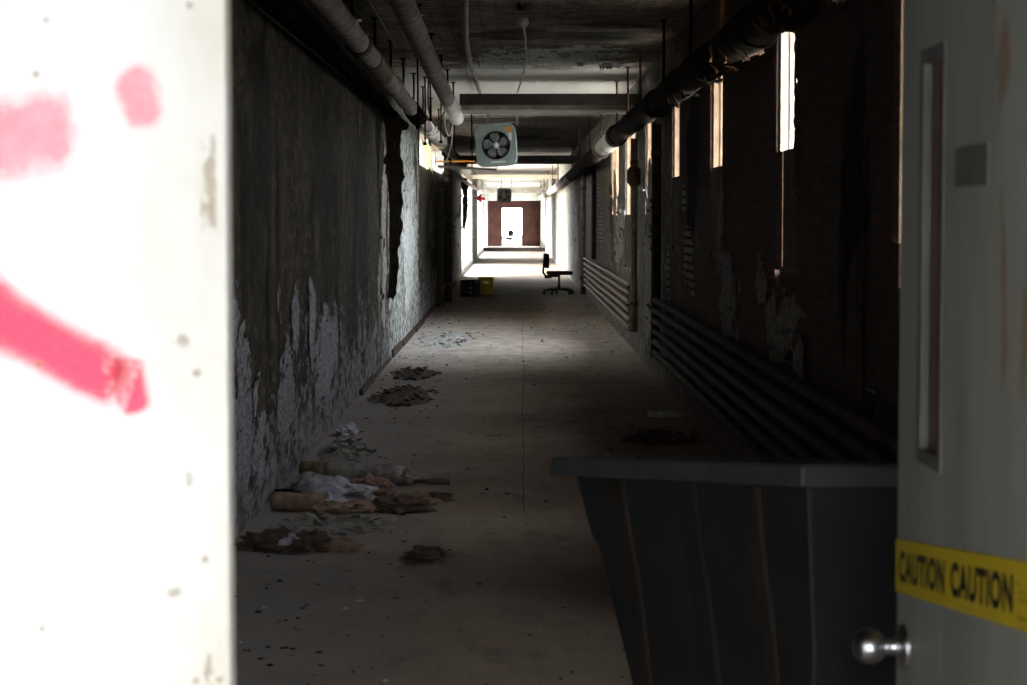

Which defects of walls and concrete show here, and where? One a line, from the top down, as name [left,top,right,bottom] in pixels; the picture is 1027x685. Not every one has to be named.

peeling [377,113,439,342]
peeling [233,274,339,508]